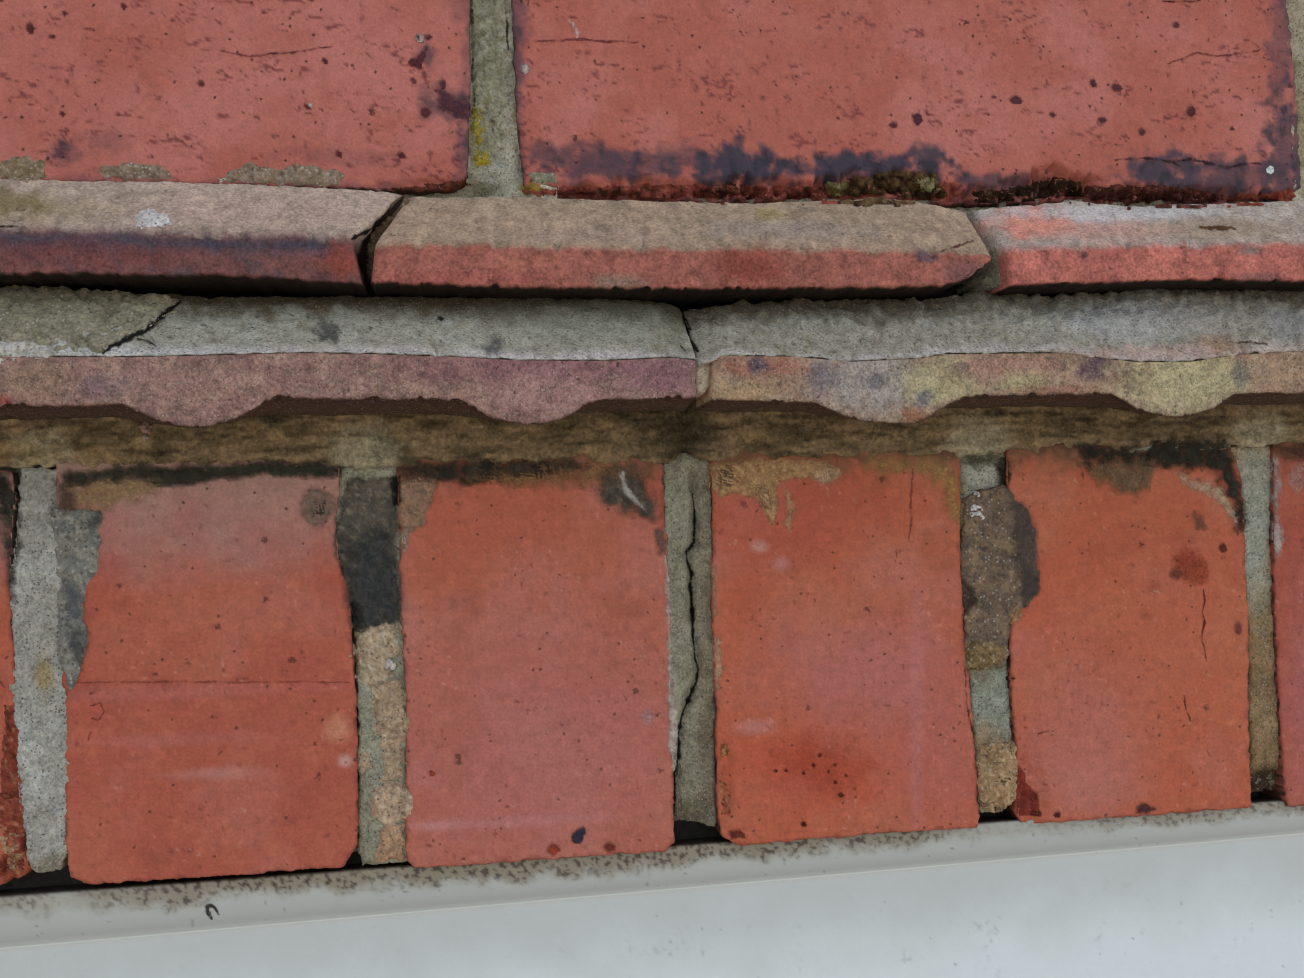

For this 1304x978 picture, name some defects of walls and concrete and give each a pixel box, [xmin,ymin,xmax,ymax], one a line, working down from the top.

crack [223,46,331,57]
crack [468,0,476,107]
crack [505,1,638,50]
crack [351,196,404,294]
crack [102,298,182,354]
damp [1081,444,1153,494]
damp [1180,476,1236,522]
damp [0,488,21,597]
crack [673,491,699,812]
peeling [964,638,1007,671]
peeling [349,622,413,863]
peeling [976,738,1042,817]